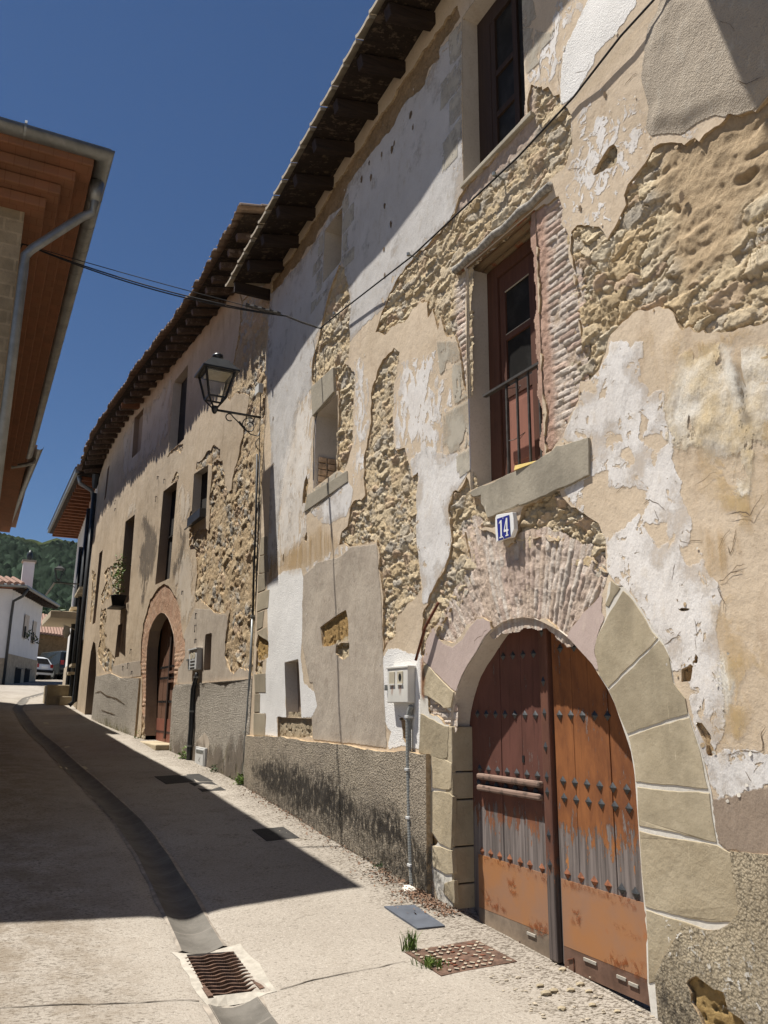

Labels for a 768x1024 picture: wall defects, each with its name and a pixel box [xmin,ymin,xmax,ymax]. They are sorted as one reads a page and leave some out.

spalling [141,0,768,803]
spalling [91,564,122,672]
spalling [689,977,745,1024]